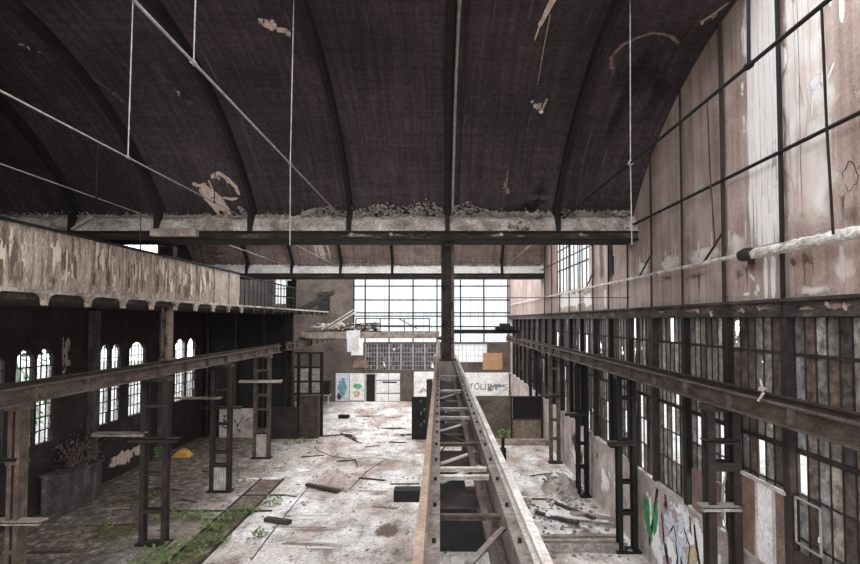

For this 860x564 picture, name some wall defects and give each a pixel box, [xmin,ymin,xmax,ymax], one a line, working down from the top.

spalling [258,18,291,37]
peeling [530,0,556,114]
water stain [660,0,845,270]
peeling [192,171,244,216]
peeling [0,220,27,284]
peeling [44,235,77,288]
peeling [93,243,213,299]
peeling [62,337,71,374]
peeling [107,445,140,468]